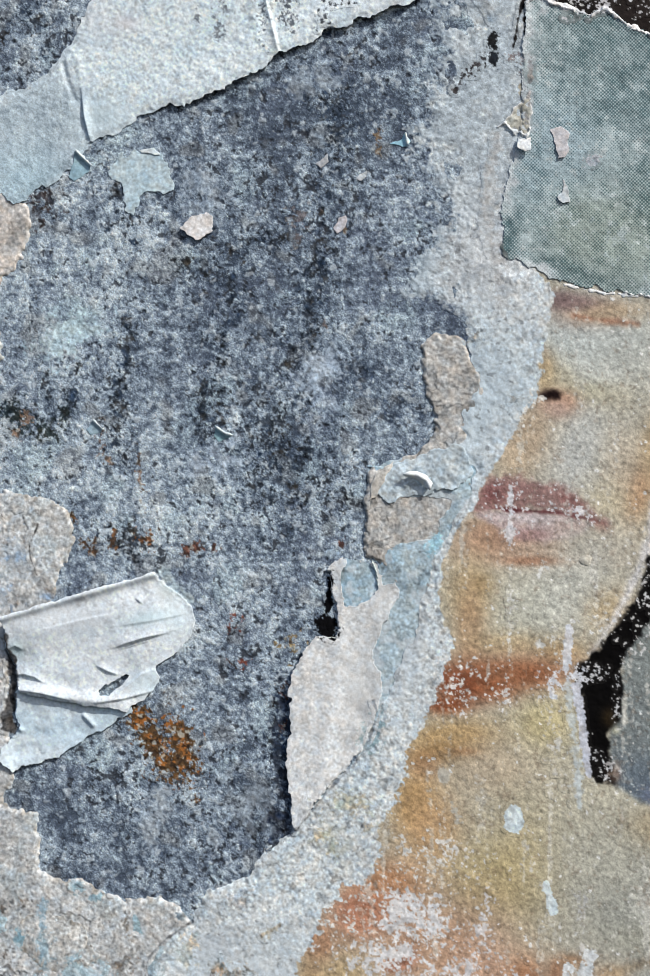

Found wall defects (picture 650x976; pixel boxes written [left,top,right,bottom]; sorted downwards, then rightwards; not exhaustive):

peeling [546,0,650,38]
peeling [180,212,213,240]
peeling [333,215,347,234]
peeling [369,462,393,500]
peeling [422,466,650,813]
corrosion [117,691,212,807]